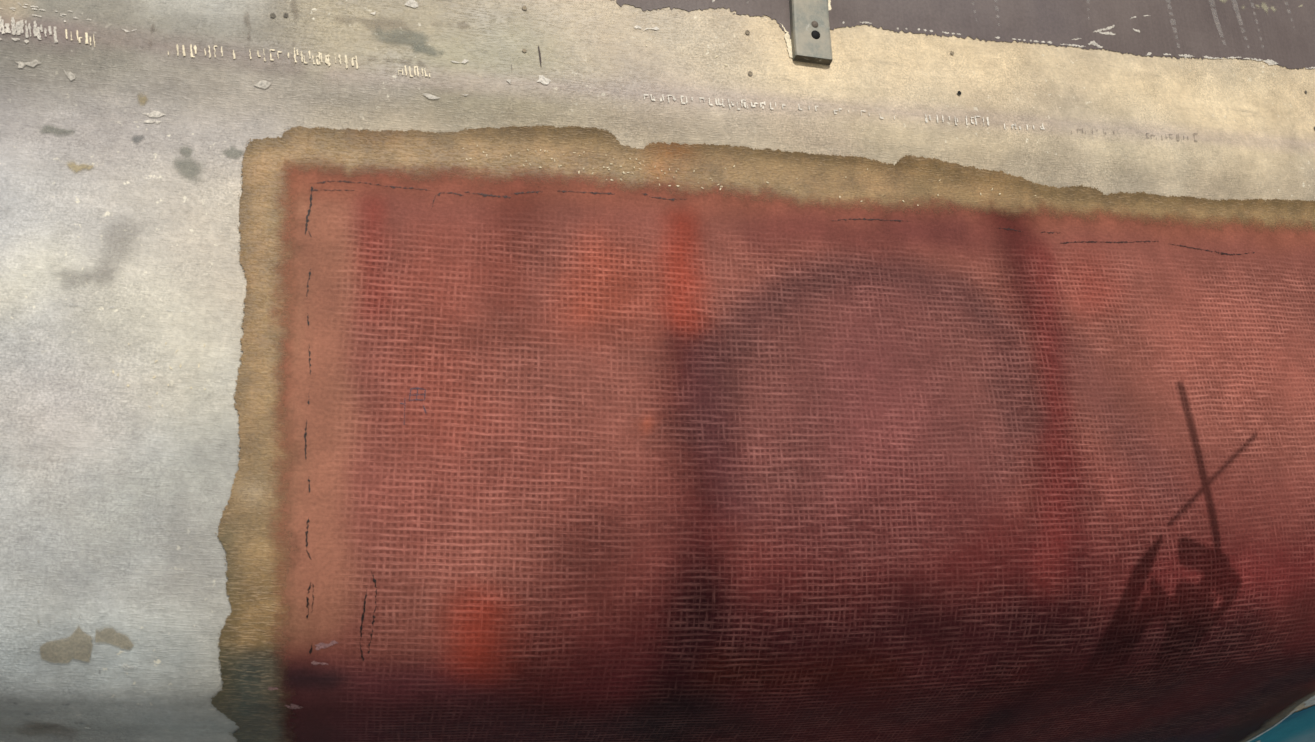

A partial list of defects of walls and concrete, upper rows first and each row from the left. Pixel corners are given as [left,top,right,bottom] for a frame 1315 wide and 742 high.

peeling [780,23,793,58]
peeling [995,25,1115,48]
peeling [16,59,44,68]
peeling [168,44,358,69]
peeling [398,65,430,77]
peeling [1146,52,1278,65]
peeling [644,94,818,111]
peeling [139,111,166,124]
peeling [925,114,1045,129]
water stain [40,615,133,668]
peeling [1247,695,1315,742]